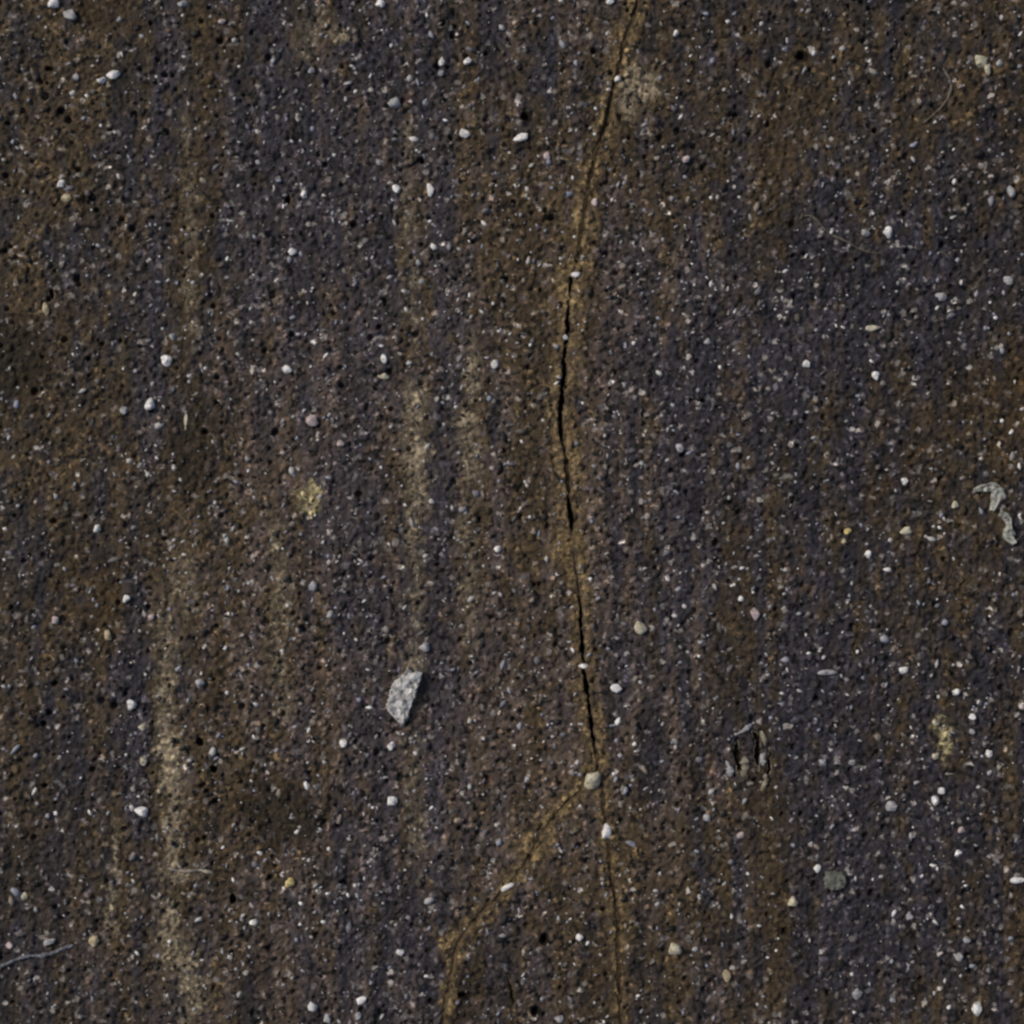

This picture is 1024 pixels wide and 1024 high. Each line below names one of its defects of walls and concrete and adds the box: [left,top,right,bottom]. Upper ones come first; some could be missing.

crack [440,0,640,1024]